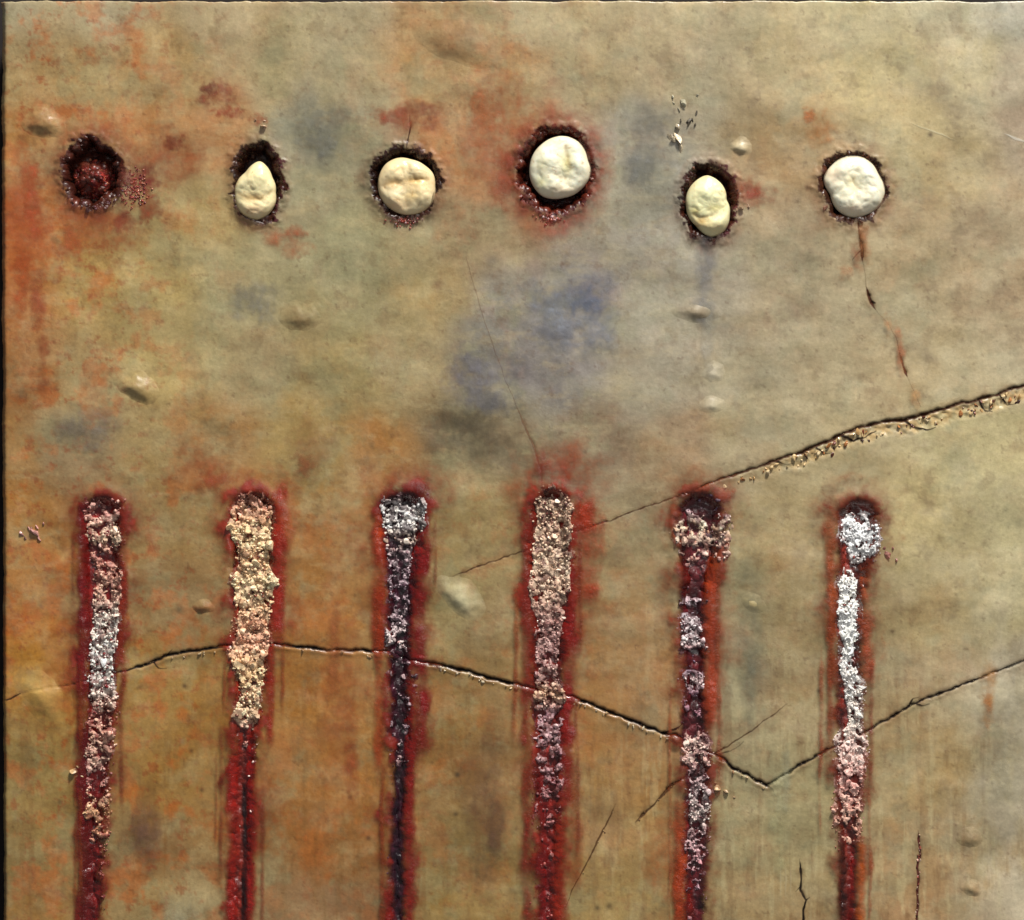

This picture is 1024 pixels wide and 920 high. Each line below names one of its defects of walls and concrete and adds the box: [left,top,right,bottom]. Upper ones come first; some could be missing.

spalling [59,134,126,213]
corrosion [507,111,604,227]
crack [706,221,1024,488]
corrosion [68,488,138,920]
corrosion [214,478,295,740]
corrosion [370,475,439,920]
crack [424,661,525,690]
corrosion [513,477,599,887]
crack [573,695,681,740]
crack [708,713,835,789]
corrosion [815,491,891,729]
crack [863,660,1024,733]